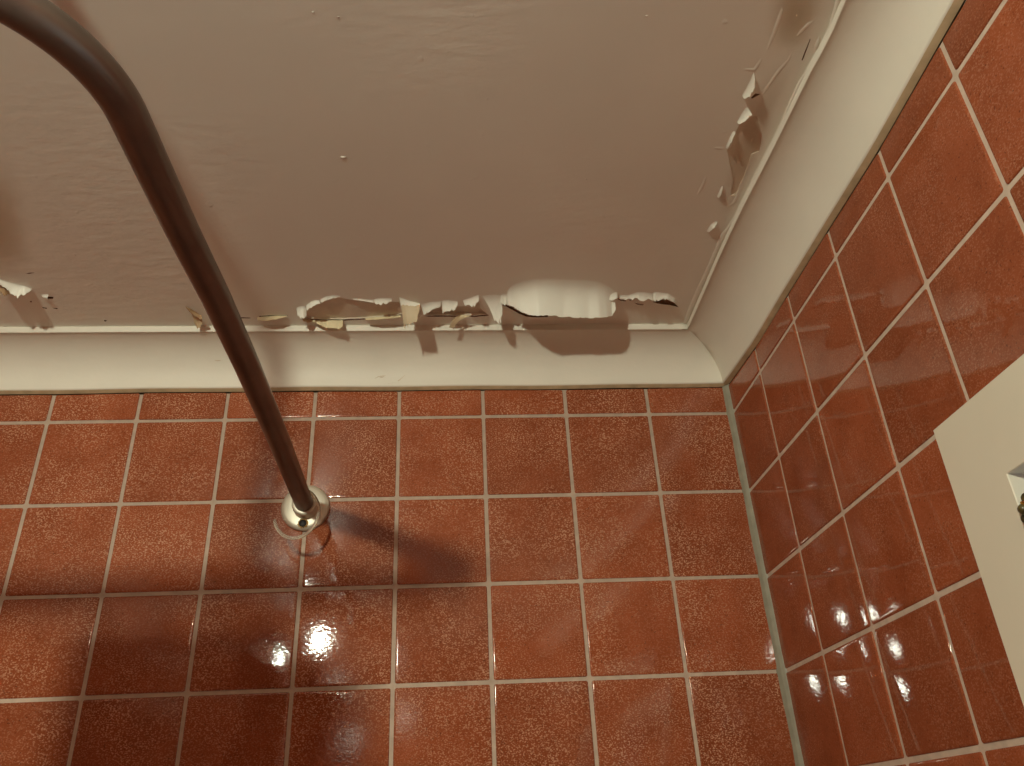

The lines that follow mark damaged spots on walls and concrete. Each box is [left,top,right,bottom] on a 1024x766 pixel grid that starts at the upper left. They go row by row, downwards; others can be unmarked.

peeling [717,73,762,198]
peeling [0,279,31,299]
peeling [296,278,678,328]